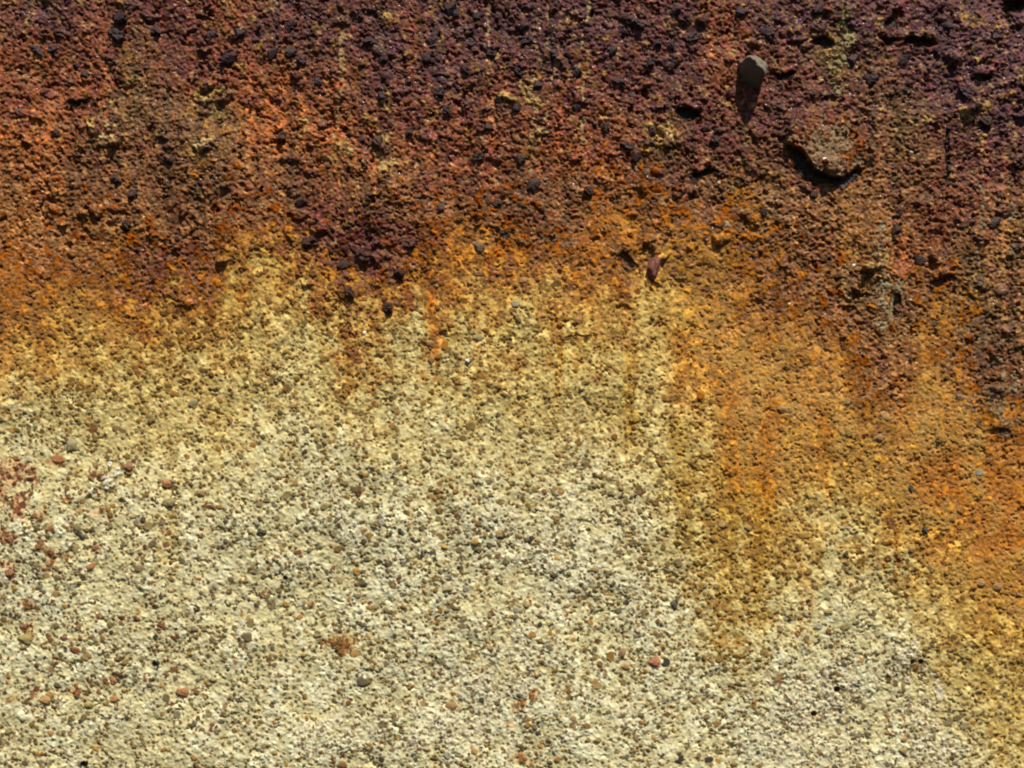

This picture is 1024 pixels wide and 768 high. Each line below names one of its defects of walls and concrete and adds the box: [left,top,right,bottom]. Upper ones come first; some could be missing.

rust [321,324,393,402]
rust [422,330,443,356]
rust [455,346,525,395]
rust [664,365,705,416]
rust [711,470,760,514]
rust [743,512,824,567]
rust [873,550,902,568]
rust [914,570,939,604]
rust [984,626,1024,666]